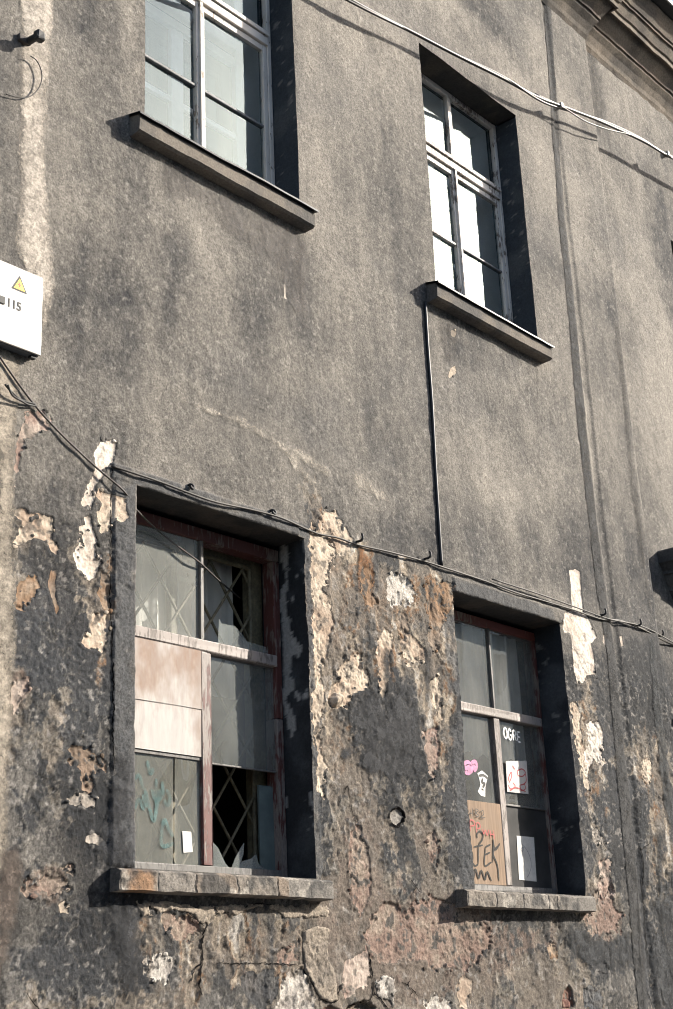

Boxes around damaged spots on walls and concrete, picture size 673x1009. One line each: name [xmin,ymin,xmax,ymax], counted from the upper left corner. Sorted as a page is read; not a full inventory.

flaking render [12,508,59,554]
flaking render [73,435,129,653]
corrosion [357,543,379,607]
flaking render [308,506,456,800]
damp [384,650,392,691]
flaking render [562,569,606,684]
flaking render [65,736,107,808]
flaking render [570,701,606,791]
damp [649,640,673,826]
spalling [86,833,103,846]
crack [174,902,388,1009]
flaking render [136,816,493,1009]